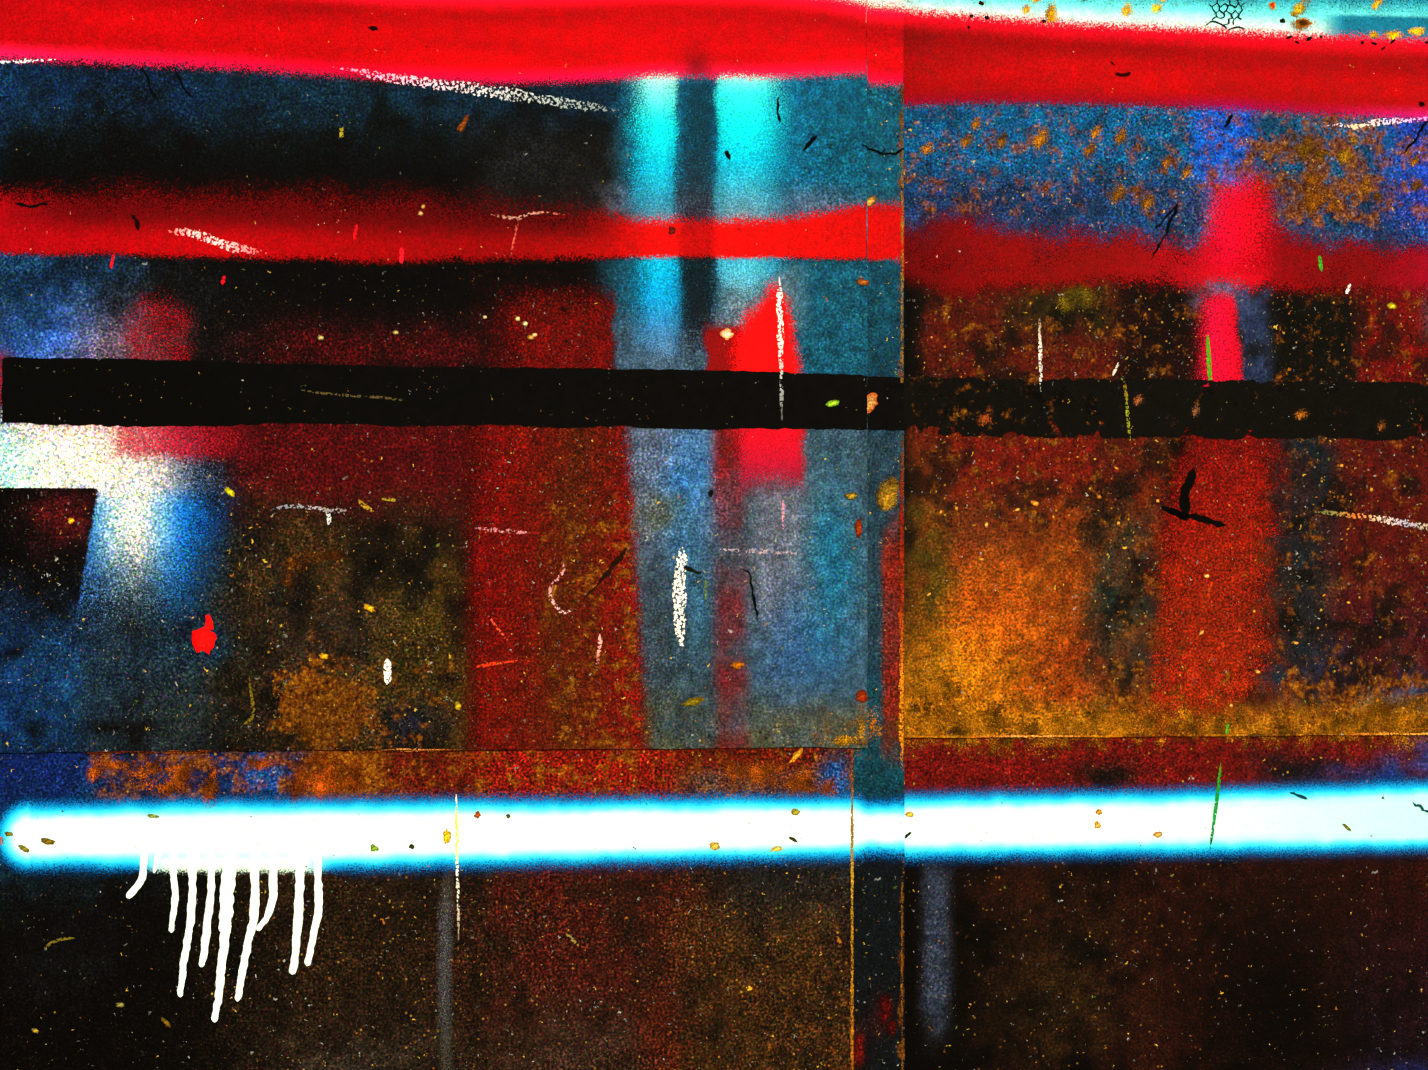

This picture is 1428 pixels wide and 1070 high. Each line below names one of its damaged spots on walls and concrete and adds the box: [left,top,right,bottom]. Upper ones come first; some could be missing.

crack [1206,0,1245,30]
corrosion [958,116,982,149]
corrosion [1032,125,1051,151]
corrosion [1082,125,1128,158]
corrosion [1161,155,1193,179]
corrosion [1289,132,1358,214]
corrosion [1408,155,1426,193]
crack [1,200,48,208]
corrosion [1109,184,1155,211]
corrosion [85,750,220,806]
corrosion [239,748,462,808]